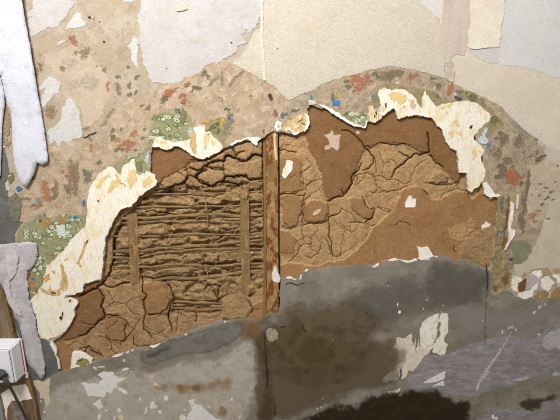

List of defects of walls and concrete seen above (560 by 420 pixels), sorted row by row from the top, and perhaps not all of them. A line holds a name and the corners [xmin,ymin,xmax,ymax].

peeling [38,74,98,146]
peeling [105,0,261,124]
peeling [447,83,484,102]
peeling [5,153,102,255]
crack [155,151,262,192]
crack [280,130,443,262]
peeling [27,257,68,296]
crack [78,228,222,357]
flaking render [50,95,560,420]
water stain [256,336,470,420]